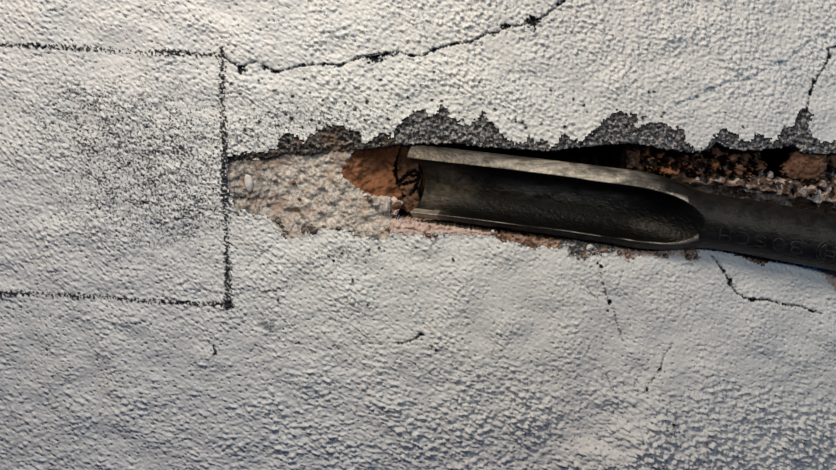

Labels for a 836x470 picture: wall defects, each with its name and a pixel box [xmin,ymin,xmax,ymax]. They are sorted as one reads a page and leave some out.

crack [222,0,566,75]
crack [674,86,717,106]
crack [737,34,836,106]
spalling [225,99,836,291]
crack [716,261,821,314]